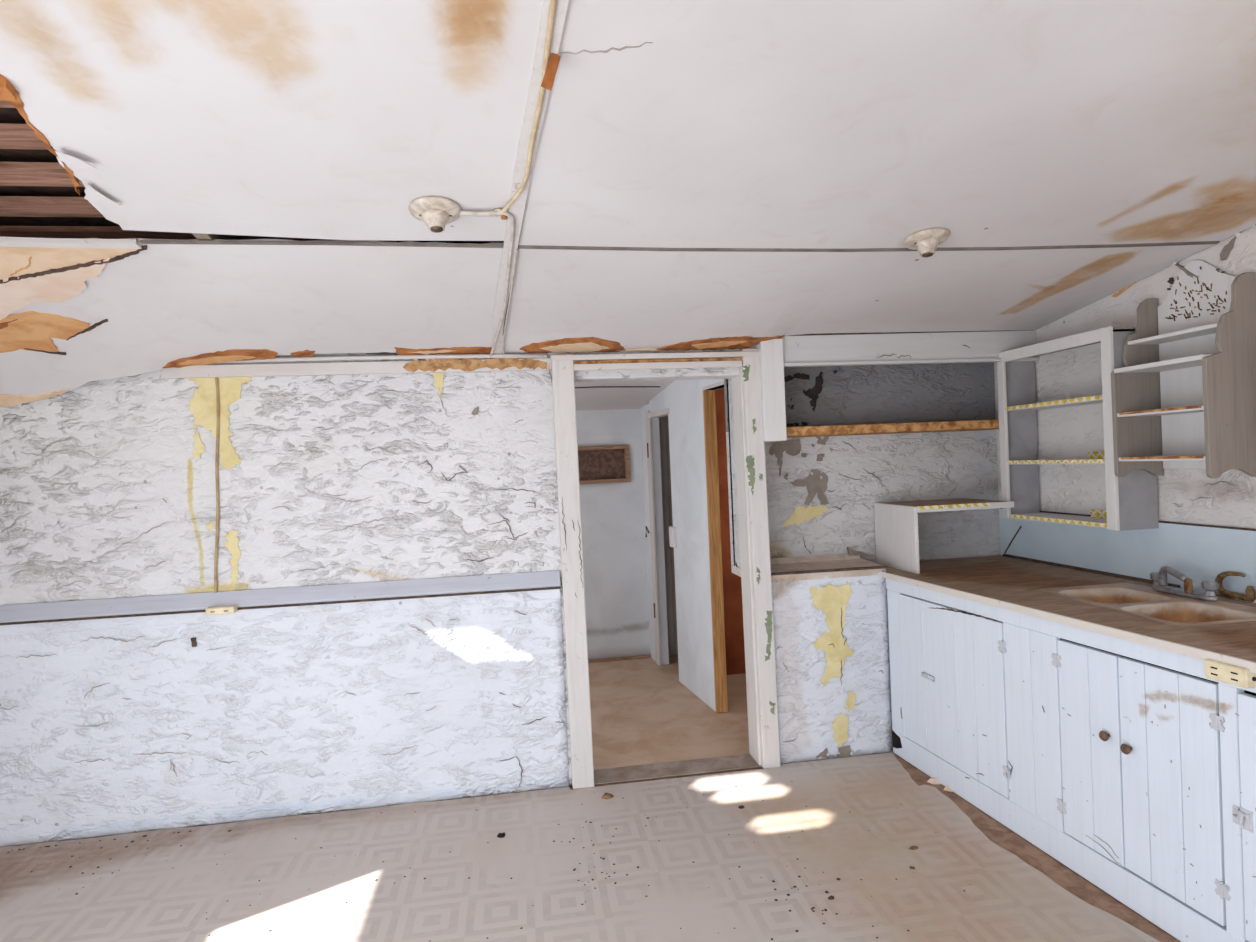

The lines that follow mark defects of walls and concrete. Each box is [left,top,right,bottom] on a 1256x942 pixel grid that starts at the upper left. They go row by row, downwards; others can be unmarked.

crack [560,42,653,54]
peeling [1171,262,1199,280]
peeling [186,377,252,469]
peeling [746,367,840,527]
peeling [204,519,241,588]
peeling [810,584,855,688]
peeling [816,688,857,759]